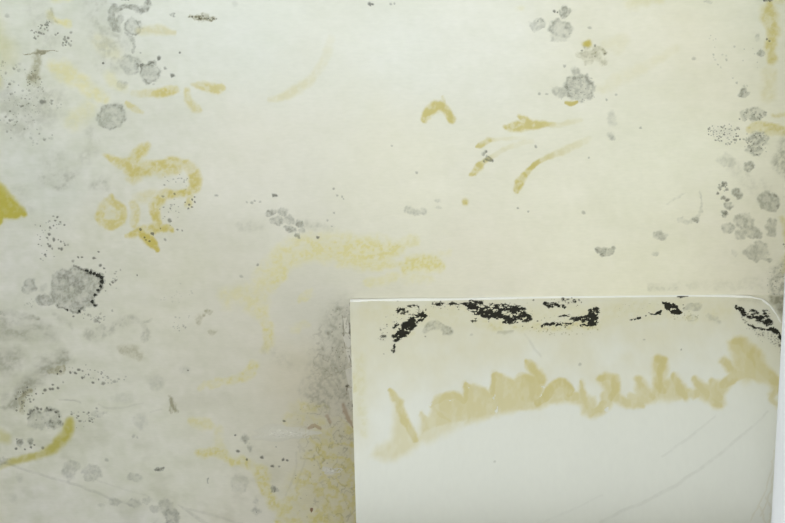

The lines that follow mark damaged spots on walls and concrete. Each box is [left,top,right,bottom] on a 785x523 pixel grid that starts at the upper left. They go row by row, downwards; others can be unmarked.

leakage [0,150,69,261]
leakage [21,251,153,363]
leakage [0,0,227,146]
leakage [93,140,205,254]
leakage [172,193,453,344]
leakage [419,95,458,126]
leakage [468,112,593,195]
leakage [528,4,575,43]
leakage [537,26,681,142]
leakage [706,0,785,173]
leakage [715,181,785,264]
leakage [341,296,781,466]